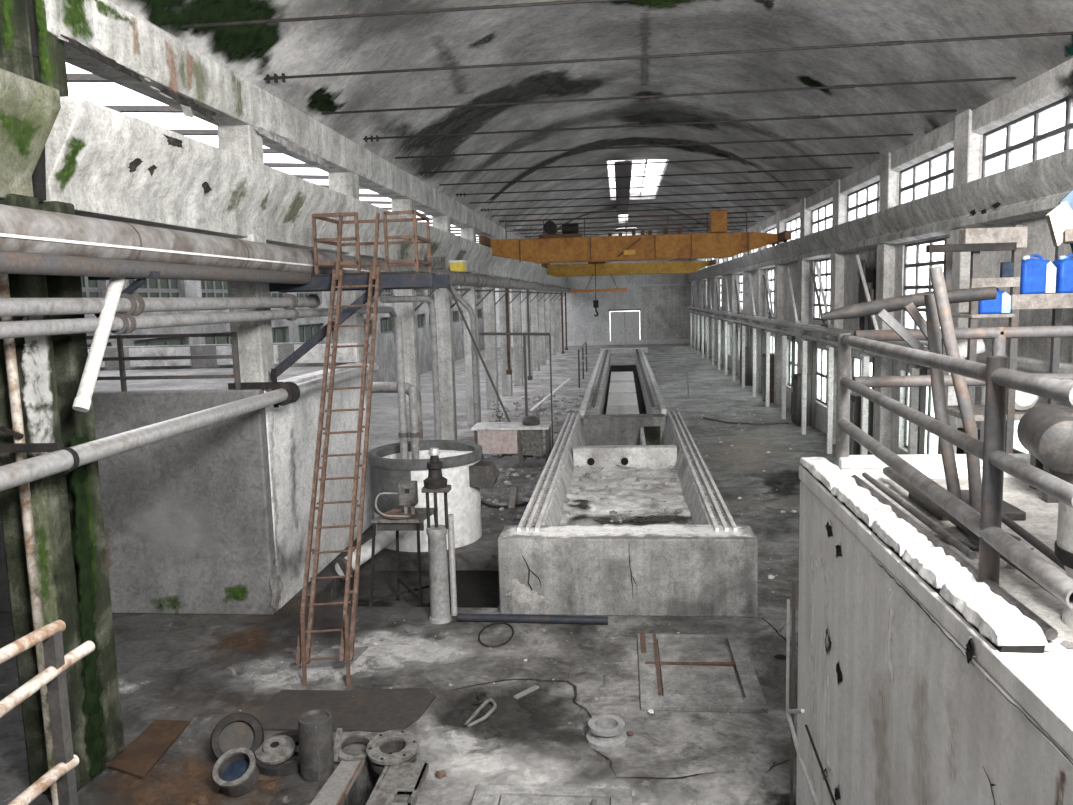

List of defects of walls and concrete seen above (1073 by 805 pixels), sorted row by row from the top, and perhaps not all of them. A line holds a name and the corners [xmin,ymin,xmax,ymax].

damp [377,52,603,178]
damp [474,19,780,204]
crack [522,556,541,590]